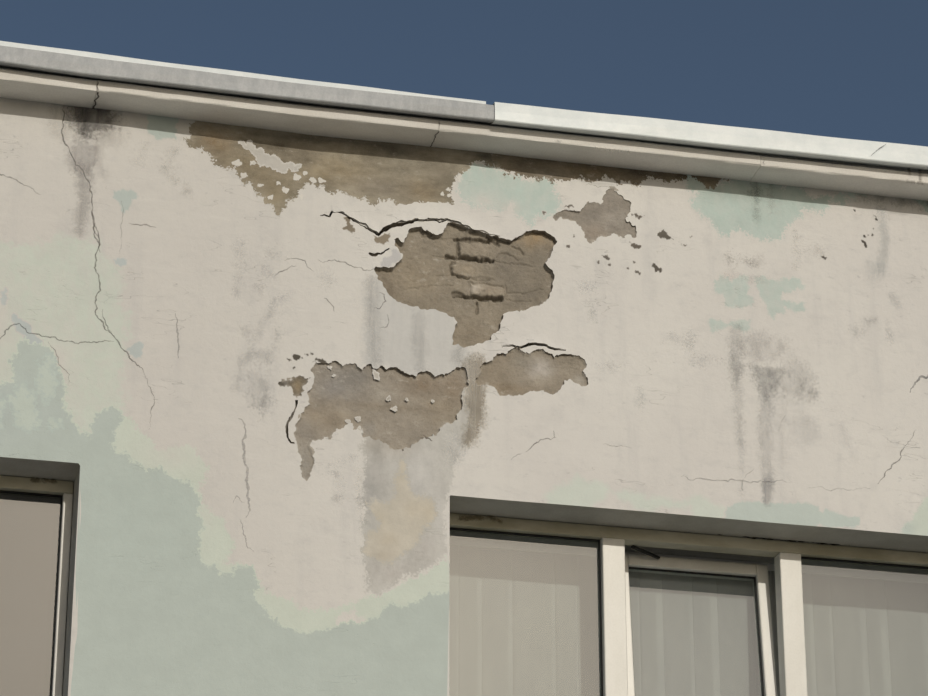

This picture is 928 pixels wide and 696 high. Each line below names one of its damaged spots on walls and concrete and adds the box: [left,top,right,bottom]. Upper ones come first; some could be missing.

crack [320,211,447,257]
peeling [183,121,870,348]
peeling [0,227,449,696]
spalling [278,346,588,481]